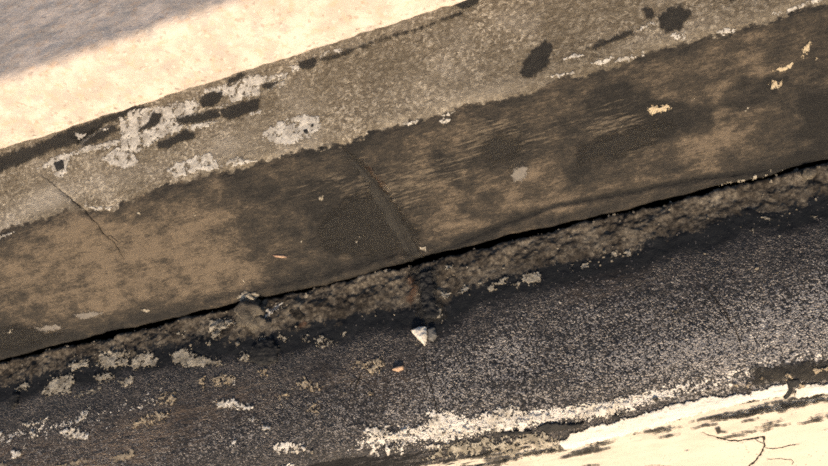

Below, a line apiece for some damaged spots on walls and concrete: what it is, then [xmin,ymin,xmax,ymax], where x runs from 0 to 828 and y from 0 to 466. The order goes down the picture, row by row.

peeling [37,61,300,178]
leakage [483,135,528,182]
crack [42,176,122,255]
leakage [74,311,103,319]
leakage [0,325,62,351]
leakage [60,406,91,439]
leakage [633,419,682,439]
leakage [691,394,828,439]
crack [703,432,797,466]